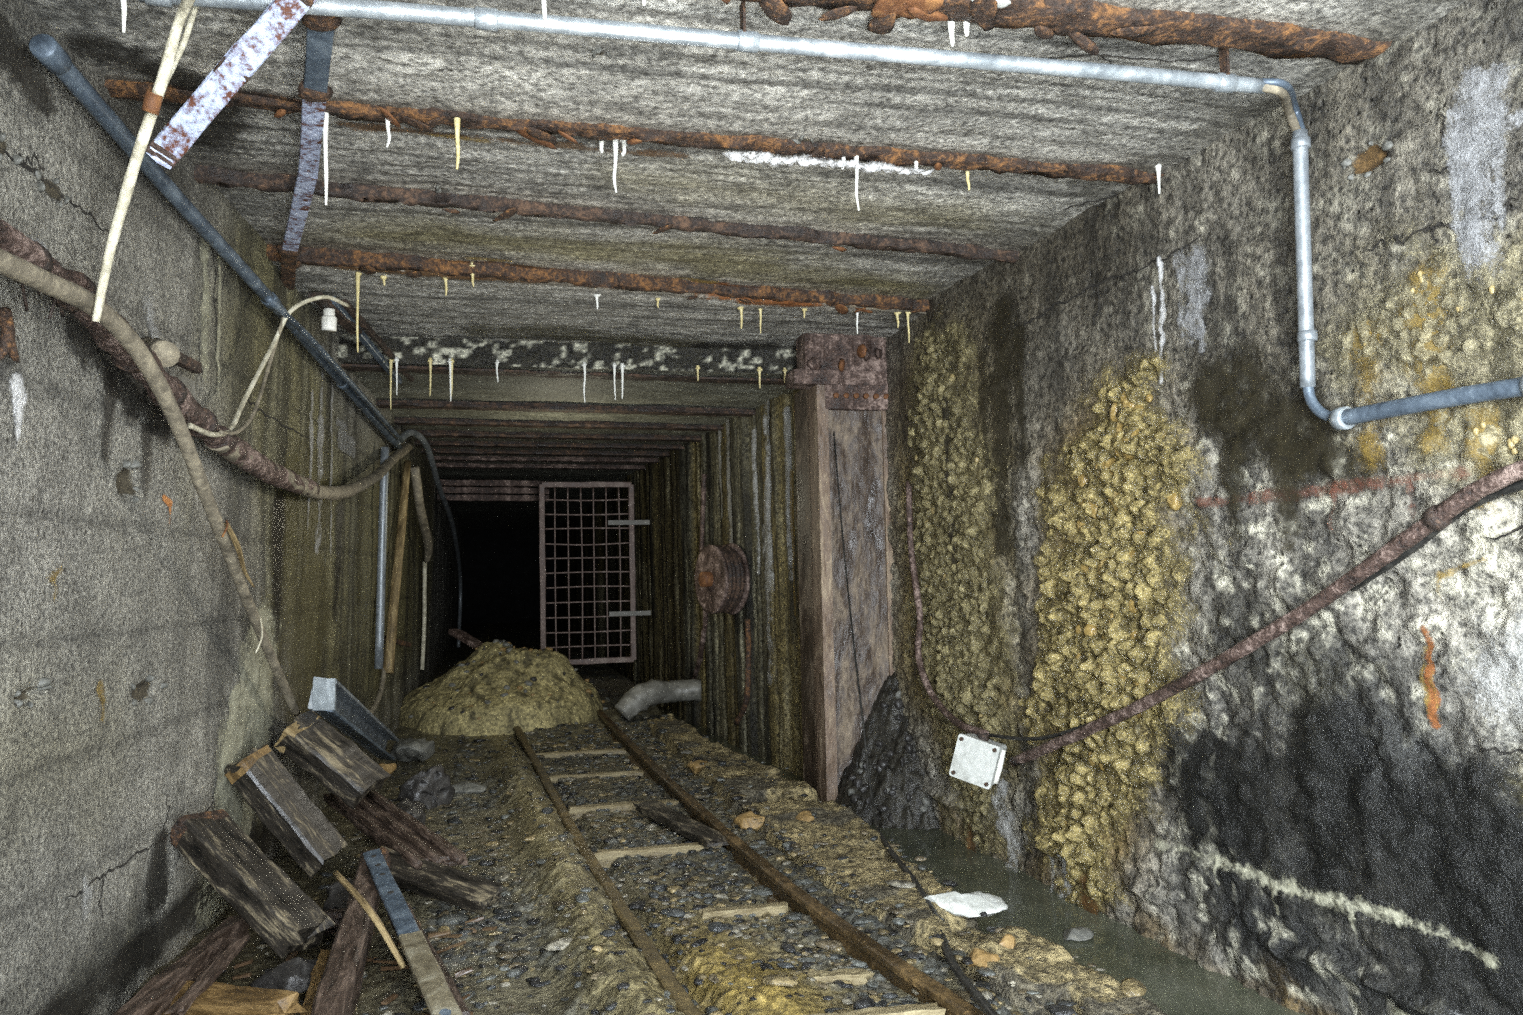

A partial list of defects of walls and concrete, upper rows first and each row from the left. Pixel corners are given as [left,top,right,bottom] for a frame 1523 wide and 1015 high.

rust [758,0,949,35]
rust [970,0,997,32]
rust [339,107,688,158]
rust [808,147,825,161]
water stain [1443,63,1523,282]
rust [339,257,539,283]
rust [682,278,873,314]
crack [1484,525,1523,540]
rust [1420,626,1441,729]
water stain [1471,614,1523,729]
crack [1473,745,1523,756]
water stain [1157,704,1523,1015]